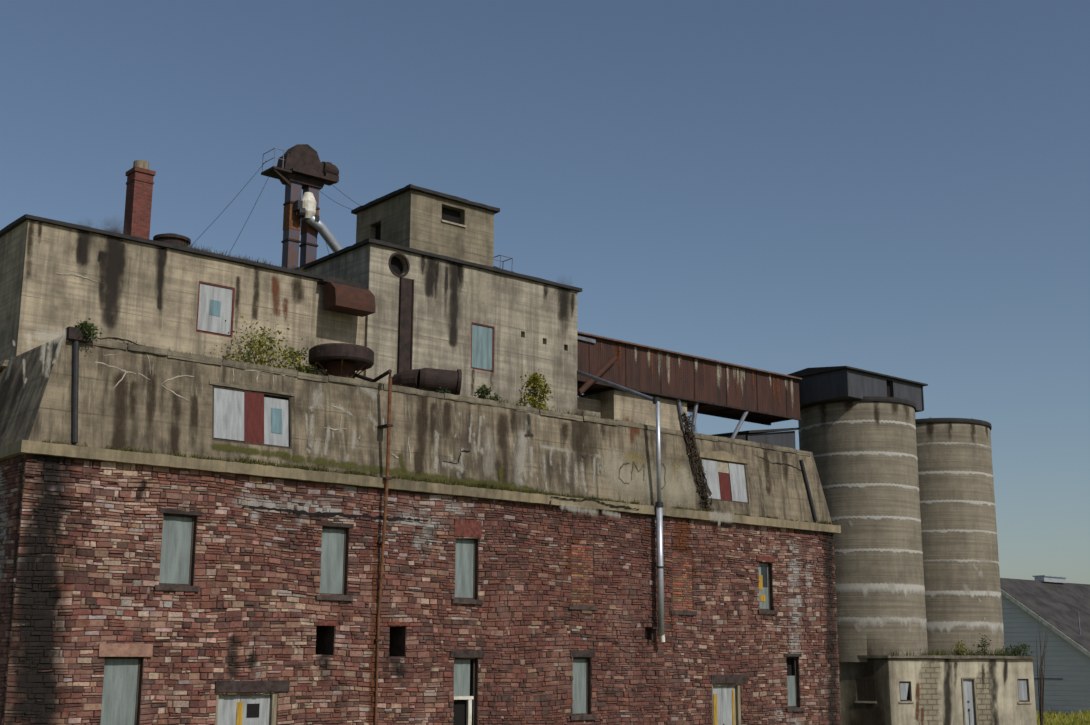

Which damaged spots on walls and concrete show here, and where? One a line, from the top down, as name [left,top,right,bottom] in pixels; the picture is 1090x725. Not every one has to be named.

leakage [77,227,125,326]
leakage [157,247,167,309]
leakage [422,255,492,346]
leakage [392,395,705,511]
leakage [0,455,69,725]
corrosion [365,529,379,725]